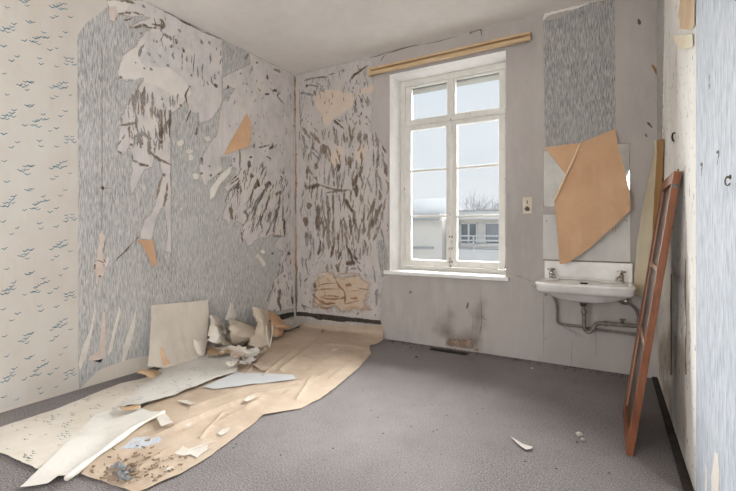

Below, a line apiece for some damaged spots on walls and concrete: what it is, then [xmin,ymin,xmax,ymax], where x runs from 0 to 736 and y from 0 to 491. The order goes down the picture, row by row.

peeling [543,0,602,20]
peeling [671,0,695,50]
peeling [107,0,389,320]